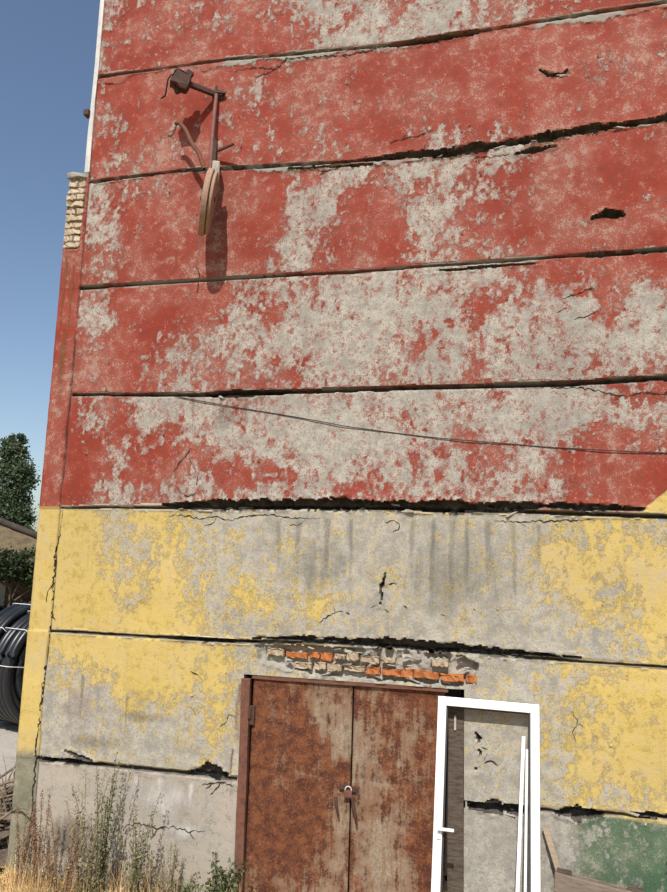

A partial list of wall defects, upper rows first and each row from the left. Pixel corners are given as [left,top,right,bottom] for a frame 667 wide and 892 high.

peeling [99,0,172,75]
peeling [171,0,251,57]
crack [230,46,388,77]
peeling [192,0,608,165]
peeling [519,40,667,125]
spalling [640,112,667,155]
peeling [63,83,186,368]
spalling [564,193,667,259]
crack [499,518,596,526]
crack [125,822,204,839]
peeling [464,707,530,892]